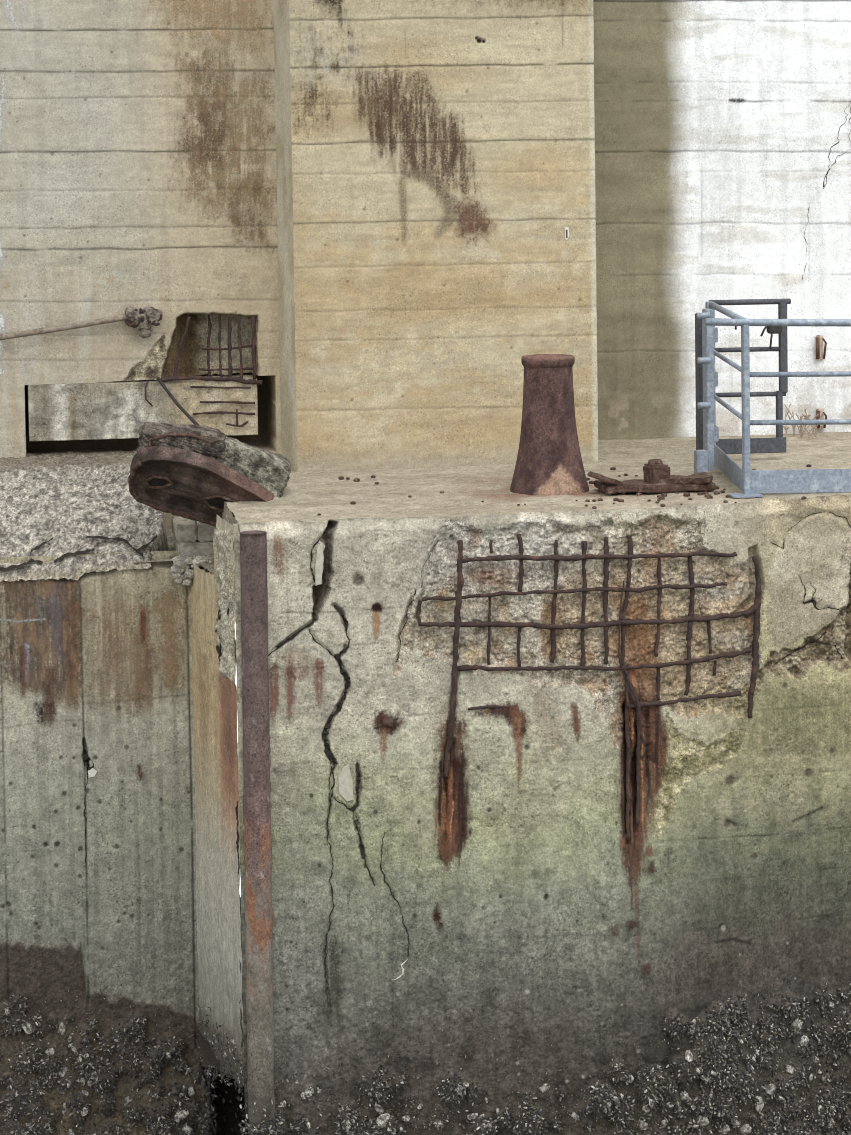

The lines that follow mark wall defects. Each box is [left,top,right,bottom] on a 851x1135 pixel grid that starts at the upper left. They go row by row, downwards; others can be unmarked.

water stain [163,0,277,246]
crack [802,101,851,280]
corrosion [0,578,152,725]
crack [0,535,157,572]
crack [268,520,410,1009]
corrosion [434,701,528,871]
spalling [392,512,851,840]
corrosion [611,597,667,951]